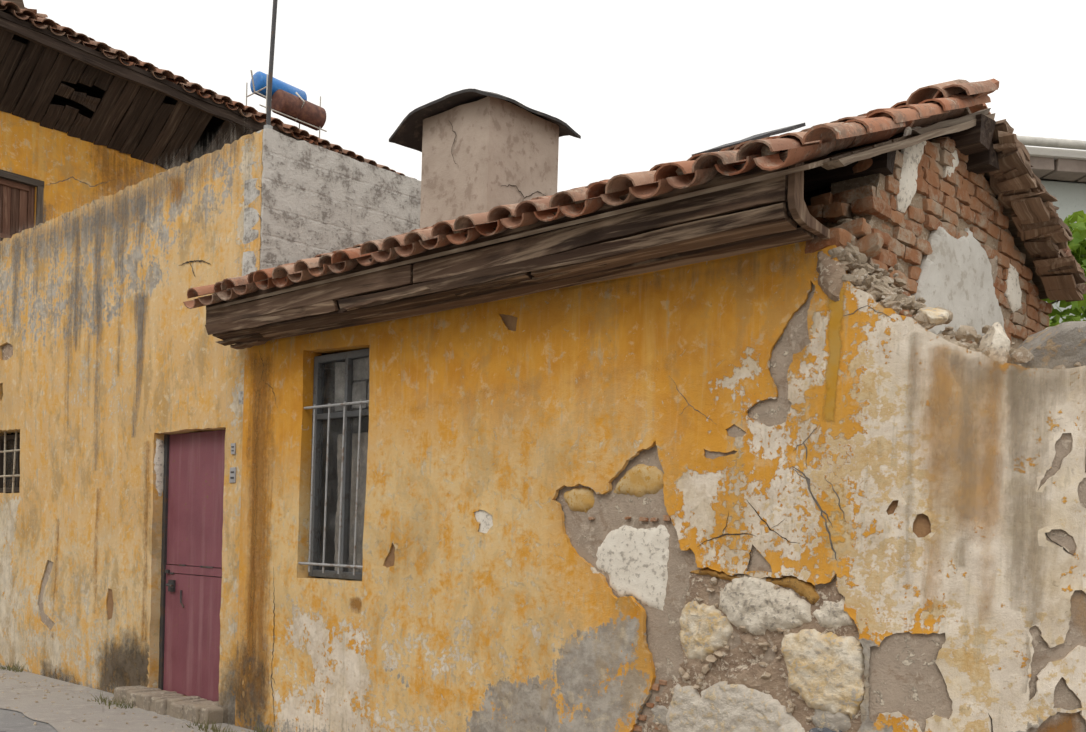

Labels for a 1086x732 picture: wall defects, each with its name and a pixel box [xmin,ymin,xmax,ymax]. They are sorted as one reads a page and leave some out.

damp [0,147,193,320]
damp [134,295,144,402]
peeling [747,283,815,427]
crack [698,499,800,565]
crack [791,428,846,560]
damp [931,362,999,522]
peeling [1038,433,1072,489]
peeling [556,444,952,732]
damp [100,636,149,690]
damp [221,650,265,731]
peeling [1027,678,1086,732]
peeling [1029,590,1086,700]